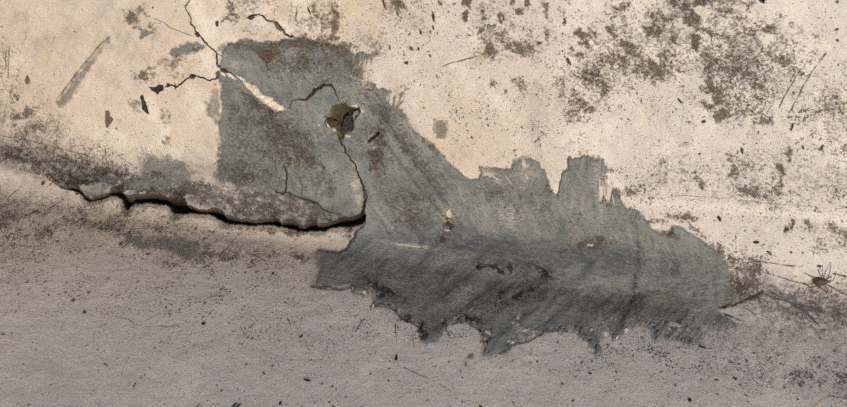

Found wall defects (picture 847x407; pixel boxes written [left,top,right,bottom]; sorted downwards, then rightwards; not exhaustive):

crack [140,0,244,115]
crack [247,14,294,38]
crack [265,79,339,111]
crack [43,136,368,252]
water stain [476,241,557,313]
water stain [648,211,761,296]